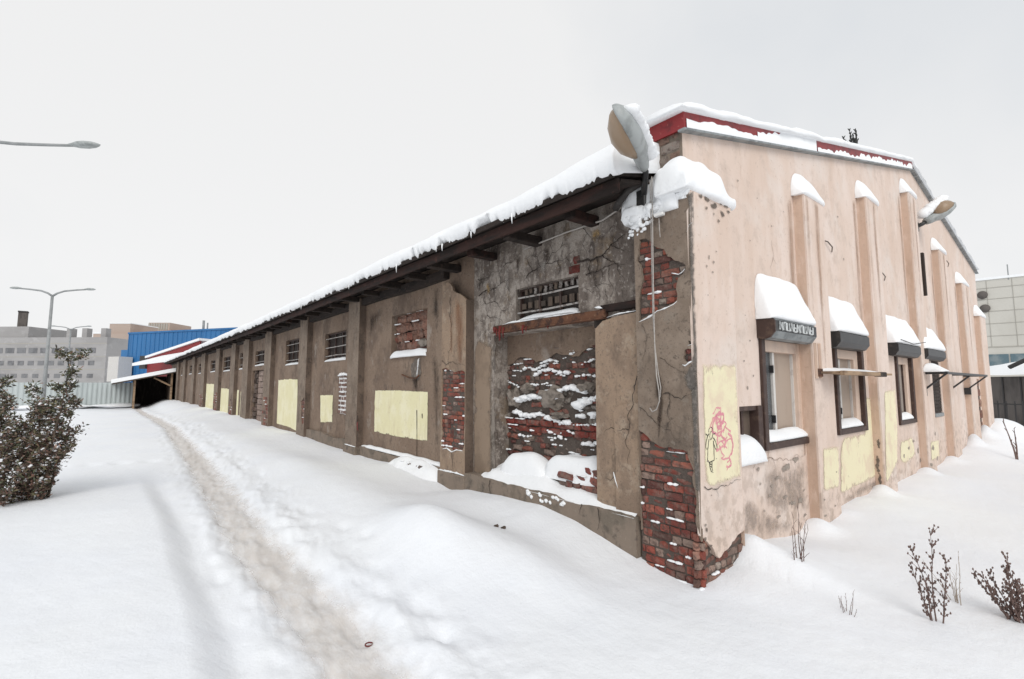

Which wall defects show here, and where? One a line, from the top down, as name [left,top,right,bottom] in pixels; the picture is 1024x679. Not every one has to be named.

crack [478,218,648,336]
spalling [638,241,686,322]
spalling [441,368,465,452]
crack [603,327,690,481]
spalling [640,431,743,590]